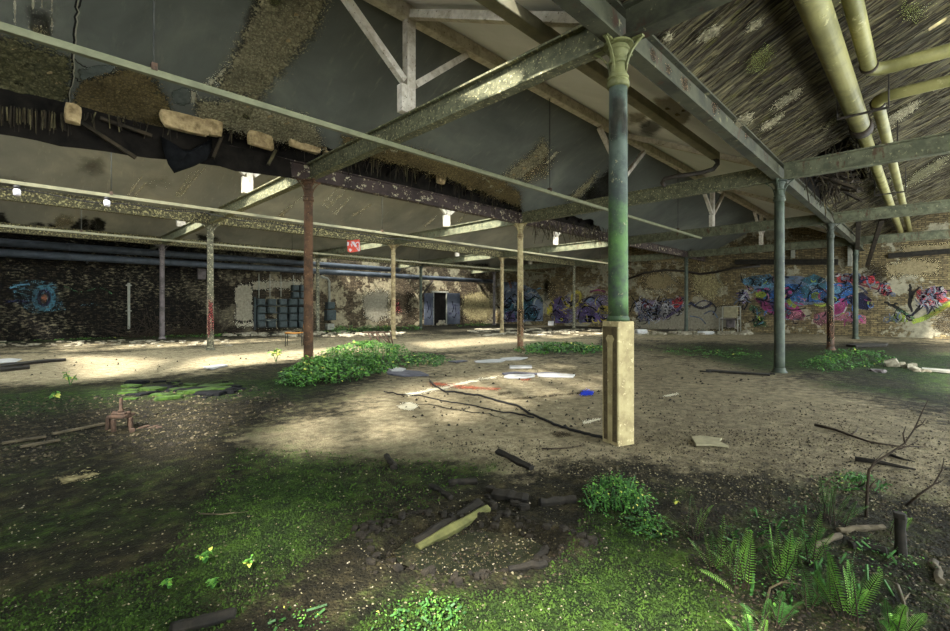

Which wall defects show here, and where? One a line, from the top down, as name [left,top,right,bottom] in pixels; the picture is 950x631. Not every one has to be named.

crack [68,0,88,102]
spalling [0,0,335,152]
spalling [363,136,558,212]